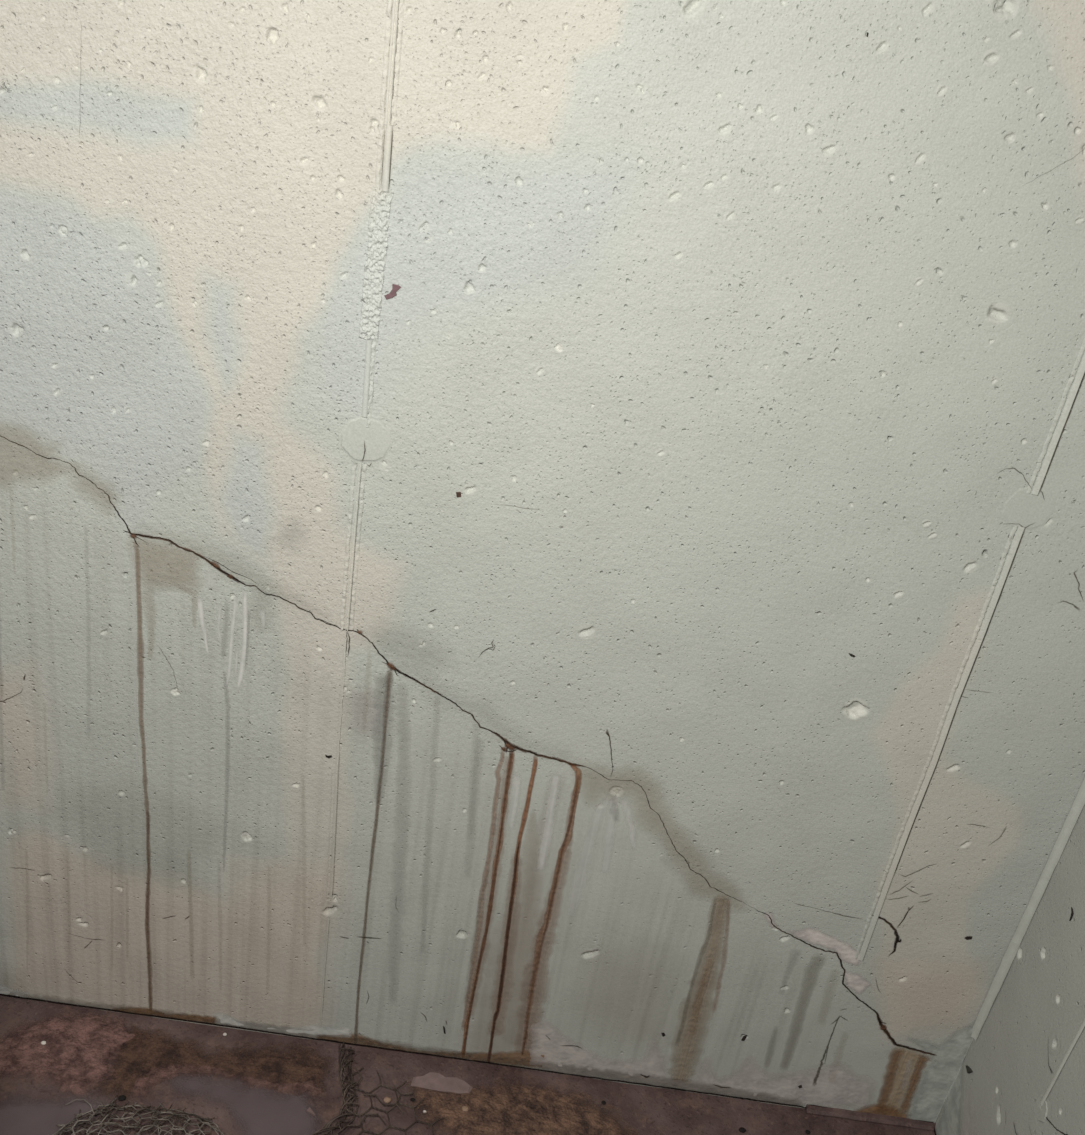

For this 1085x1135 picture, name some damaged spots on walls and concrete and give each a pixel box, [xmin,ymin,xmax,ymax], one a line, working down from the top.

corrosion [114,547,216,1024]
water stain [198,594,247,687]
water stain [217,1015,349,1036]
corrosion [319,675,581,1066]
crack [1,436,935,1083]
corrosion [857,1052,926,1118]